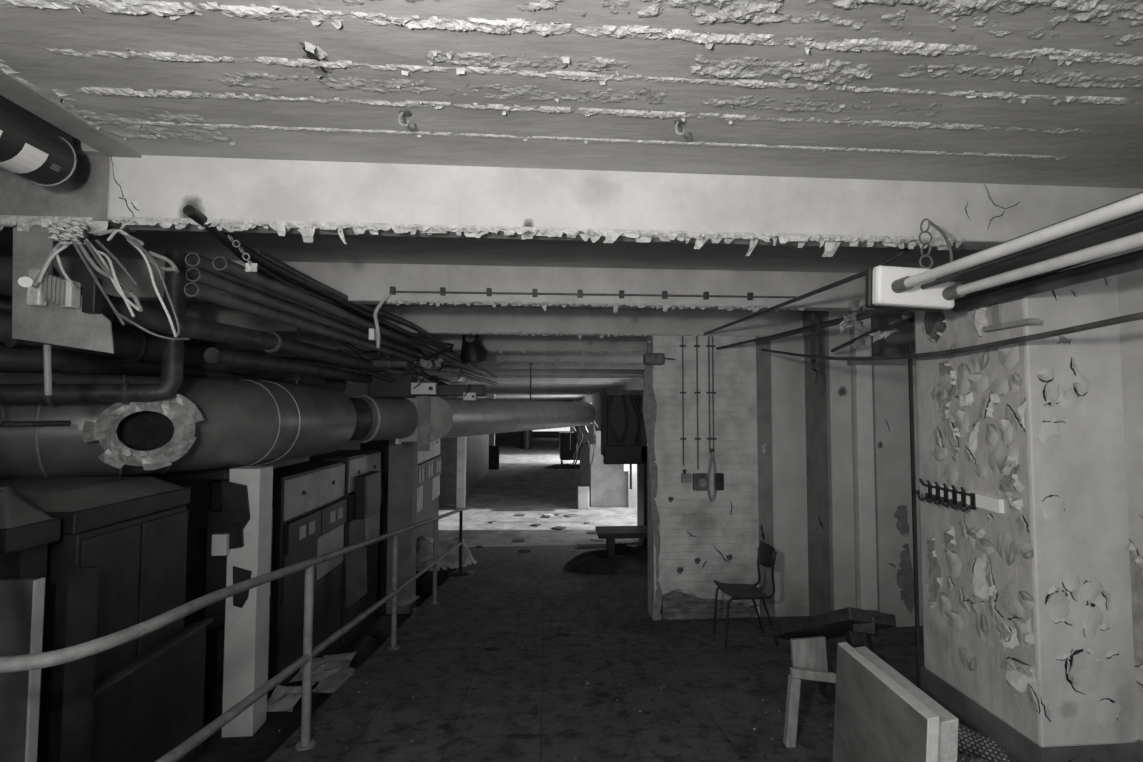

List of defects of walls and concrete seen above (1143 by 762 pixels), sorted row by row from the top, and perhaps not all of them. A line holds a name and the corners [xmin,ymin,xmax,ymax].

peeling [0,0,1143,160]
peeling [0,215,965,257]
crack [965,183,1021,232]
peeling [922,311,947,344]
peeling [971,306,988,338]
peeling [938,359,1001,462]
spalling [447,331,770,620]
peeling [999,460,1026,513]
peeling [893,505,987,616]
peeling [971,554,1040,697]
peeling [1128,543,1143,665]